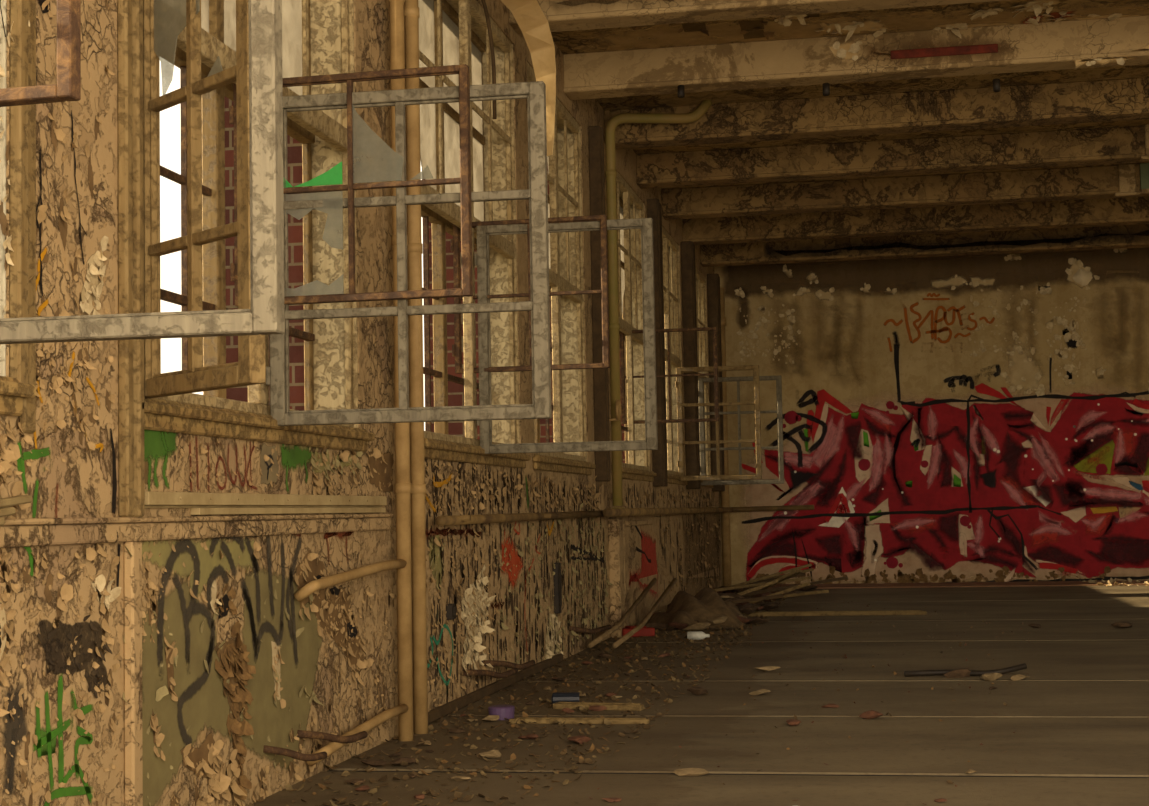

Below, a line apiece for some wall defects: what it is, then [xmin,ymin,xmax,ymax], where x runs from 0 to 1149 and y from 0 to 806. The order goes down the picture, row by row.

peeling [0,21,14,77]
peeling [0,179,14,271]
peeling [0,342,116,519]
peeling [173,434,281,491]
peeling [308,441,395,501]
peeling [0,535,397,806]